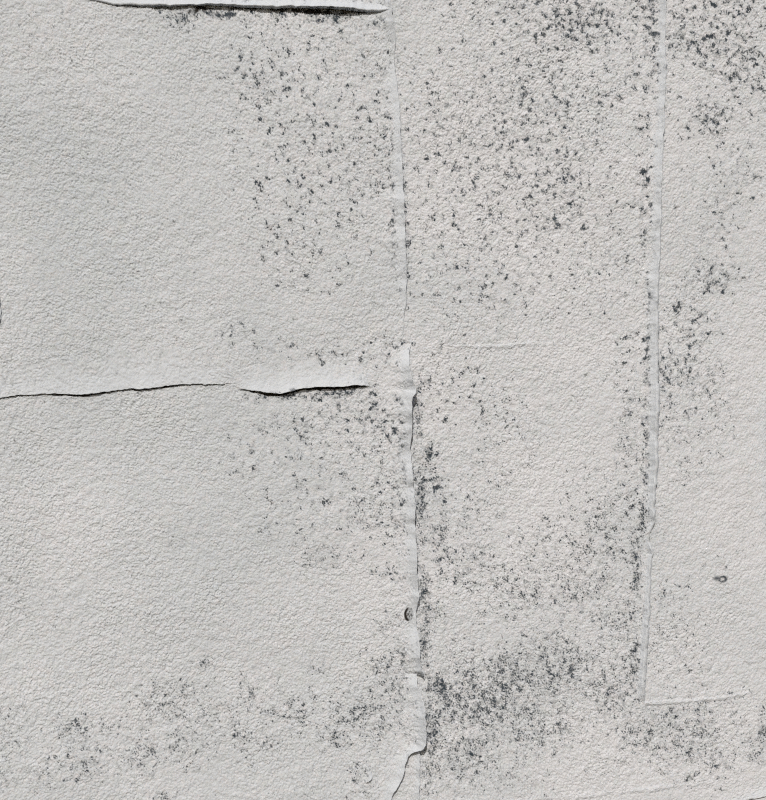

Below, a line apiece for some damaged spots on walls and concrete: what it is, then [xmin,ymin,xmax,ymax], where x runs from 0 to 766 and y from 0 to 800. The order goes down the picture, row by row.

damp [159,10,255,28]
damp [308,7,359,32]
damp [219,34,357,203]
damp [421,0,766,308]
crack [0,343,370,398]
damp [278,386,403,467]
damp [622,299,708,427]
damp [402,441,489,592]
damp [496,417,649,641]
damp [417,565,445,667]
damp [316,652,408,748]
damp [421,627,726,794]